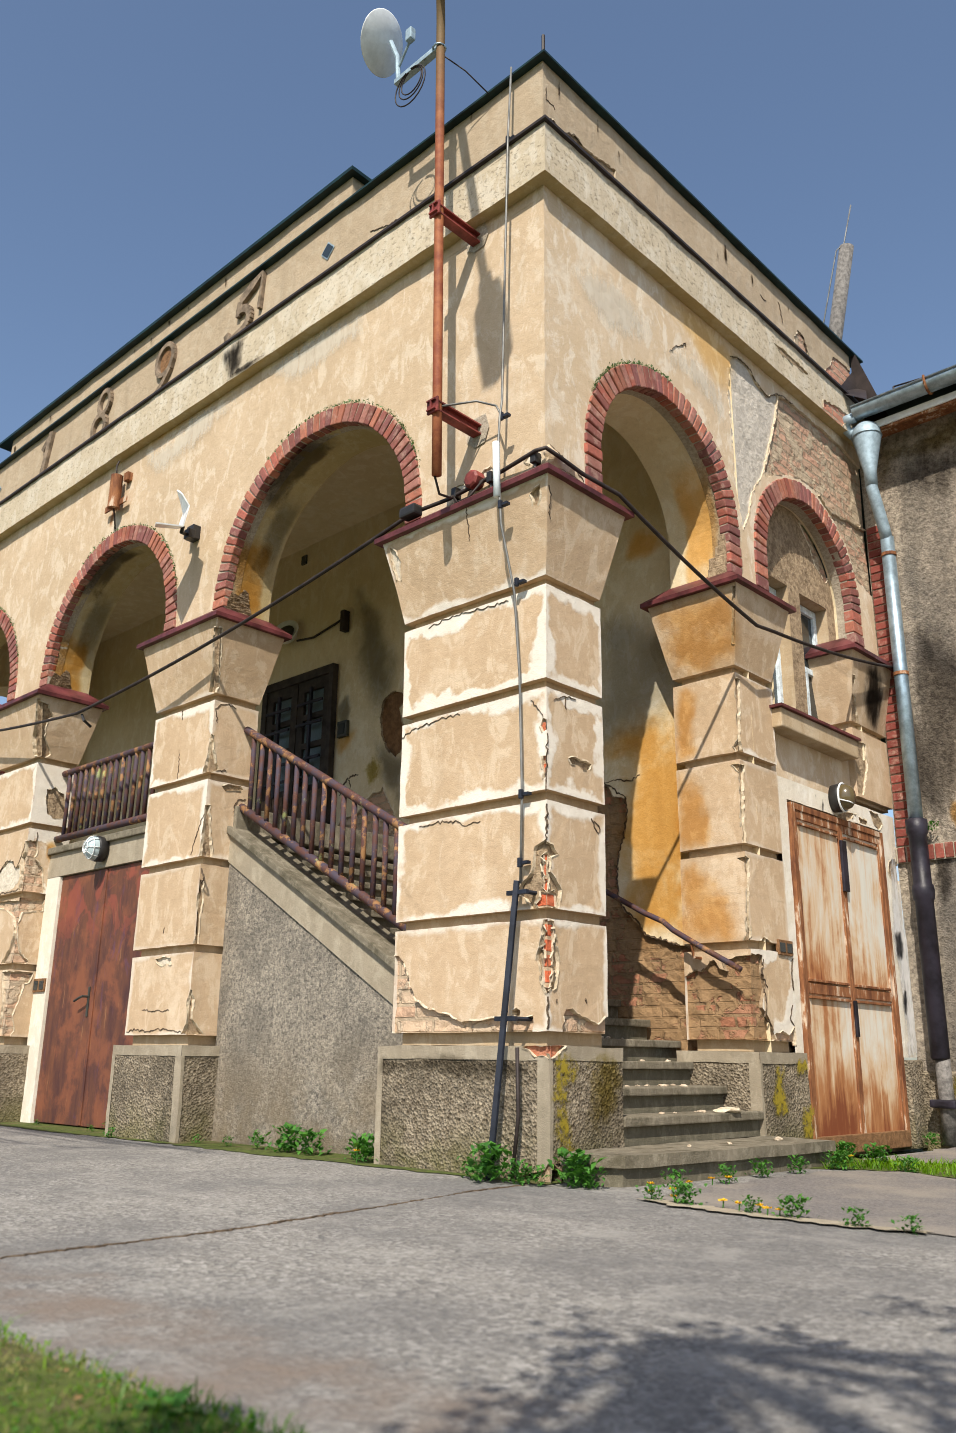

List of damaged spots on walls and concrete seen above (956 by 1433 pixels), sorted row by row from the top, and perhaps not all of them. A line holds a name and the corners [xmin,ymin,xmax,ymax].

flaking render [774,332,808,375]
flaking render [727,355,870,594]
crack [428,600,508,629]
flaking render [708,534,736,645]
flaking render [380,690,404,757]
crack [402,713,460,738]
crack [533,696,576,839]
flaking render [0,840,45,1036]
flaking render [392,677,797,1060]
crack [591,775,680,946]